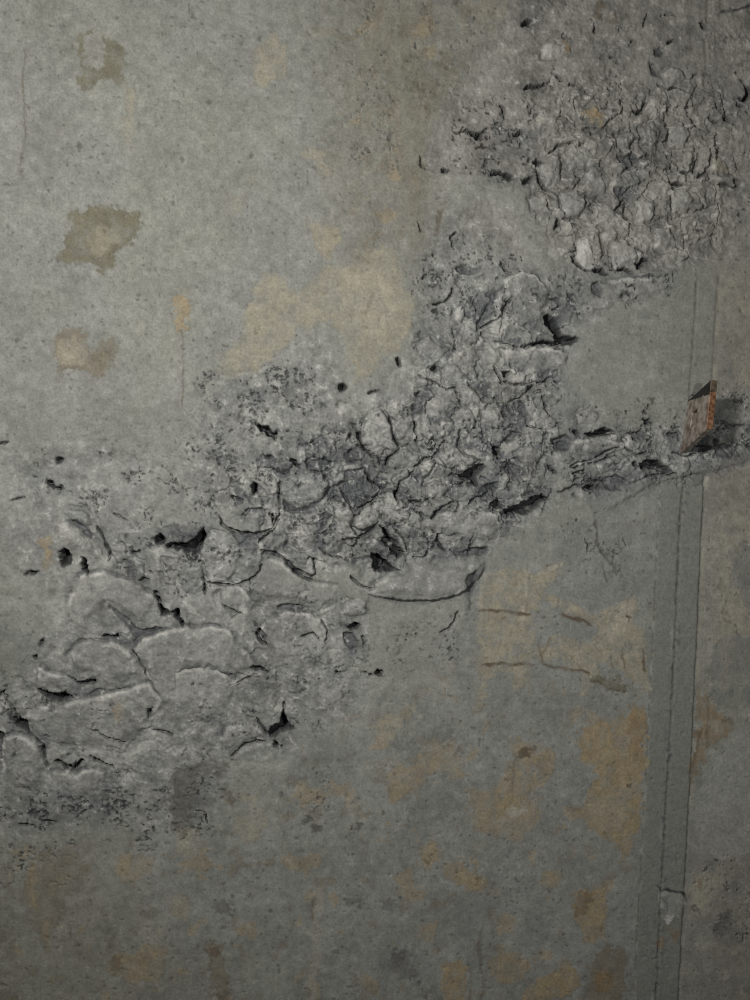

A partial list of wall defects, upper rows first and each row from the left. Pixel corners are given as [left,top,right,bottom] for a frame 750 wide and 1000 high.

peeling [73,26,130,92]
peeling [52,324,119,381]
crack [437,545,594,676]
peeling [723,539,750,620]